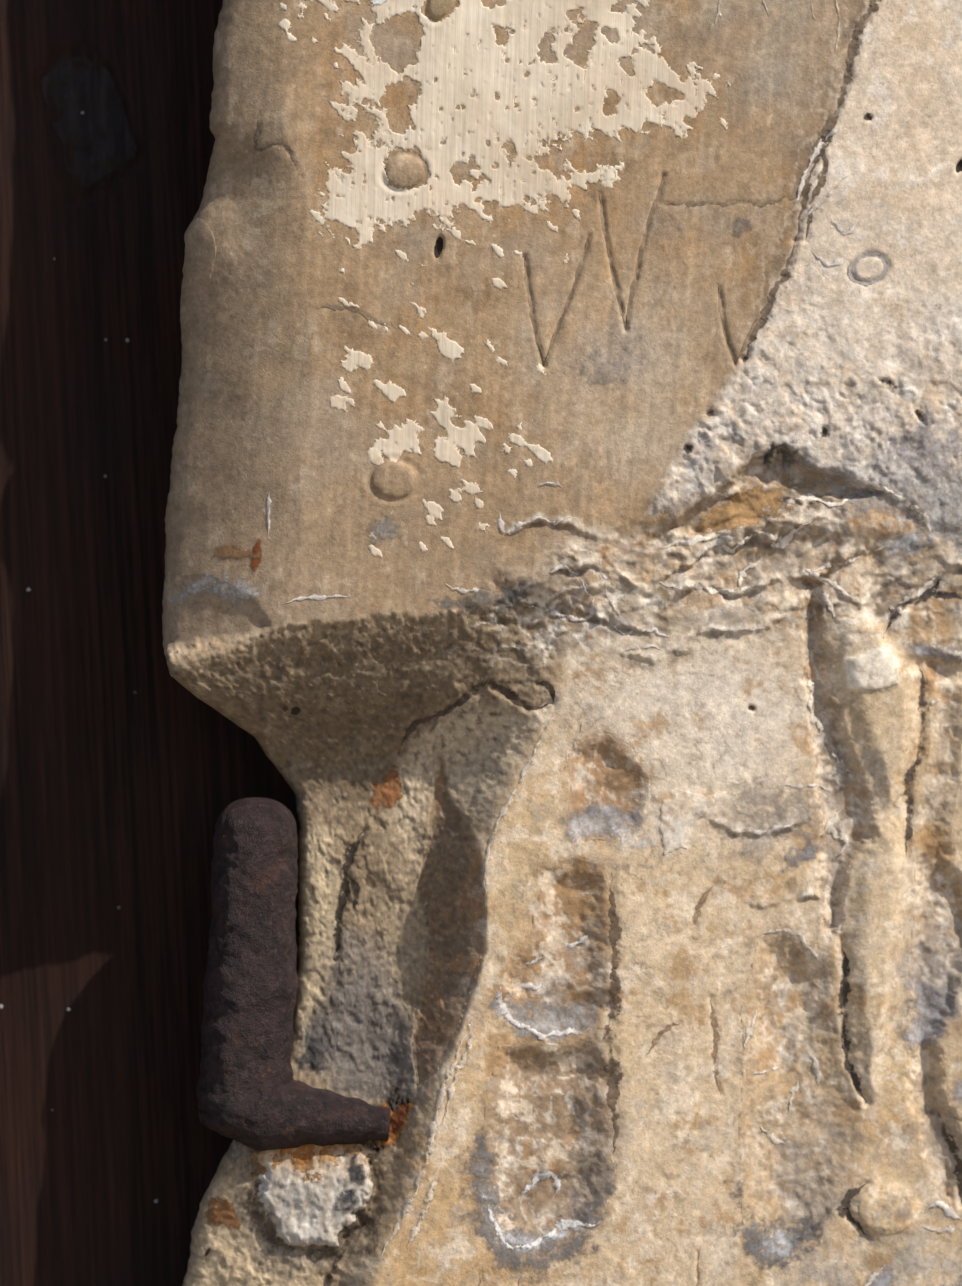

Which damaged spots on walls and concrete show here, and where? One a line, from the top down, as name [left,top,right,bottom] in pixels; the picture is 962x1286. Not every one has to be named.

peeling [278,0,731,266]
crack [665,0,882,357]
peeling [330,346,406,412]
peeling [368,302,465,362]
peeling [367,396,553,549]
corrosion [214,538,262,571]
corrosion [369,766,403,809]
crack [903,666,928,856]
crack [333,832,363,961]
crack [600,872,679,1153]
crack [838,949,867,1103]
corrosion [250,1089,414,1183]